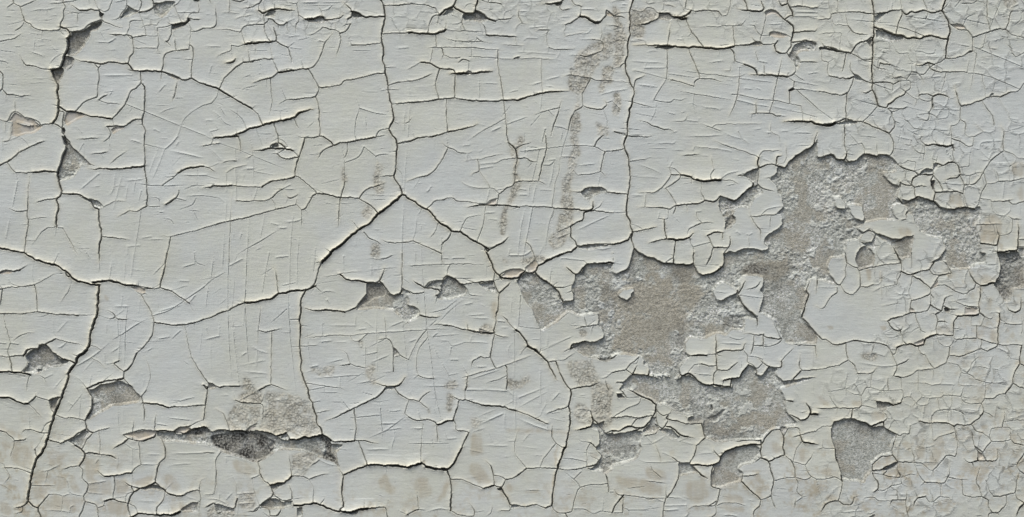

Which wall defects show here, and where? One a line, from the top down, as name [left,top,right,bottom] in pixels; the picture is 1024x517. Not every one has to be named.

spalling [52,12,104,84]
crack [397,0,1024,286]
spalling [24,345,69,375]
crack [0,0,706,517]
peeling [357,284,420,324]
peeling [427,276,468,300]
crack [681,281,783,388]
peeling [479,140,1024,489]
crack [724,216,1024,517]
peeling [71,381,142,449]
peeling [125,426,343,467]
crack [688,449,746,517]